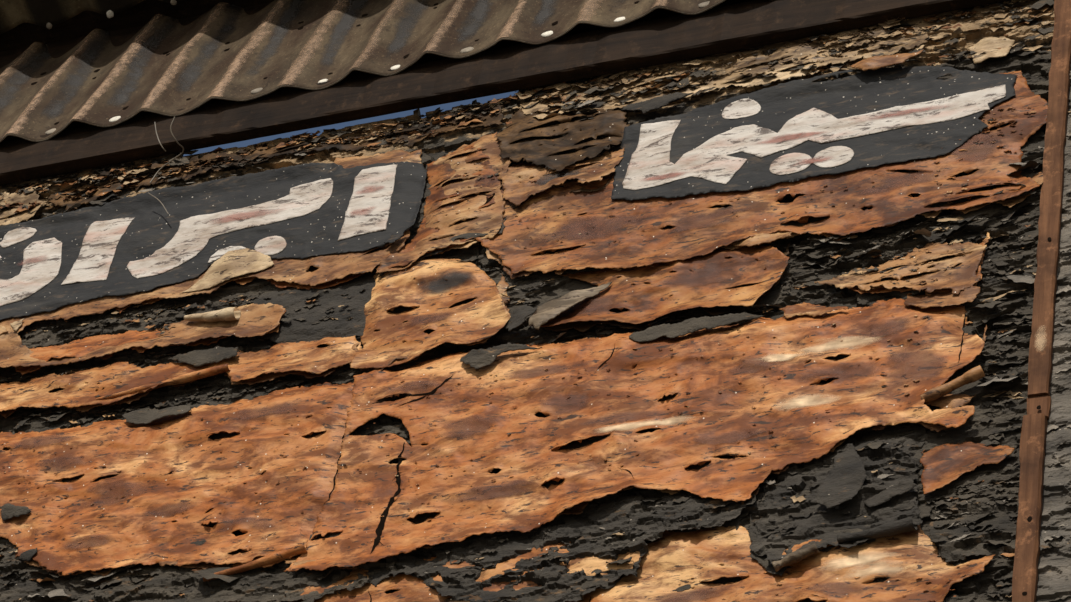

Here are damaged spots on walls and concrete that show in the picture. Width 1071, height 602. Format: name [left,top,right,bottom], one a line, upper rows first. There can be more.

peeling [0,0,1054,216]
crack [324,423,346,504]
crack [370,442,405,554]